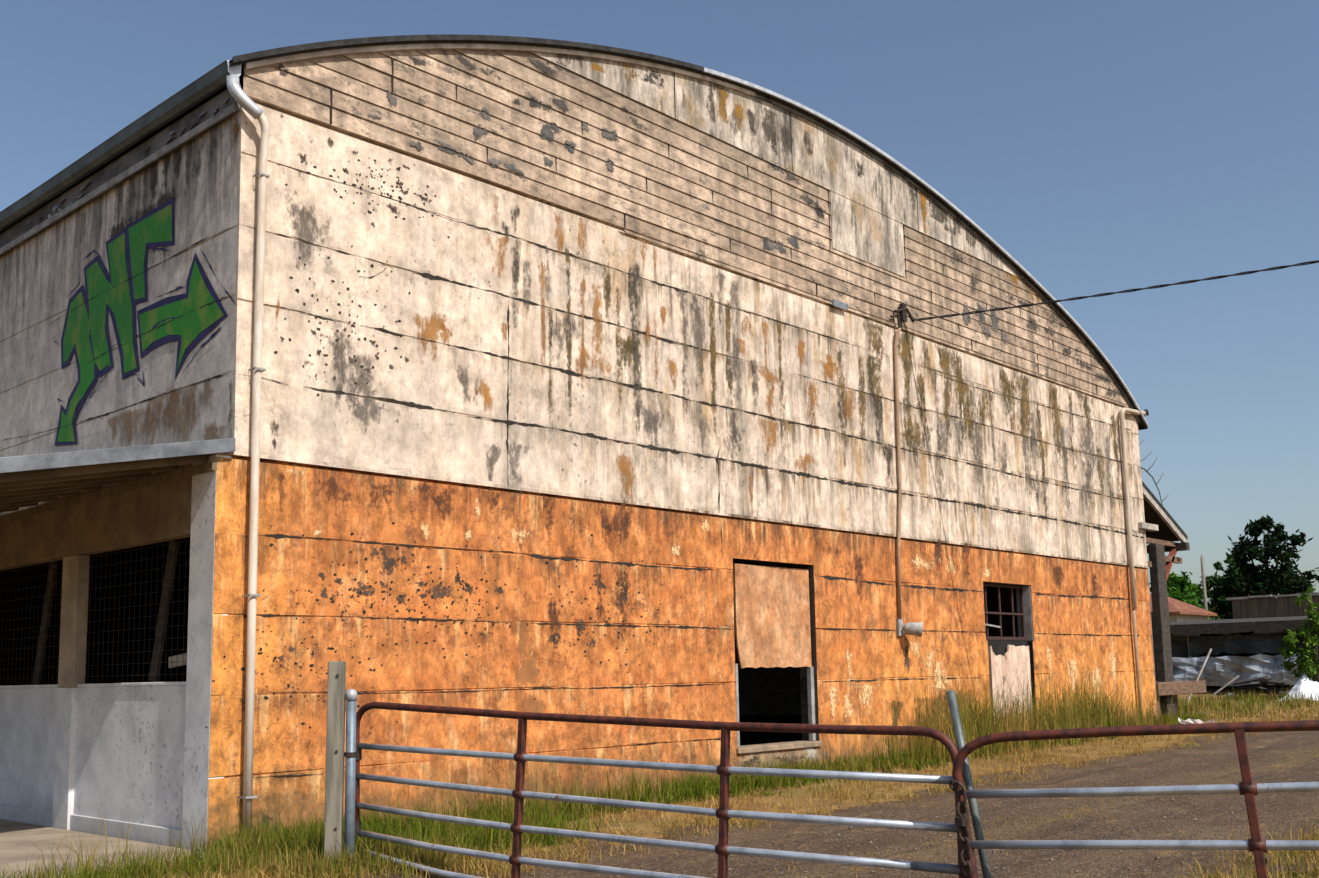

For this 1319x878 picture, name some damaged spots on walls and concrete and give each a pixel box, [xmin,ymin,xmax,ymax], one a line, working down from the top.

leakage [290,204,329,268]
leakage [502,207,531,327]
leakage [331,332,381,431]
rust [416,314,452,357]
leakage [486,444,526,508]
leakage [546,248,575,430]
rust [618,456,635,496]
leakage [603,264,664,446]
leakage [678,273,759,450]
leakage [777,323,786,458]
leakage [837,350,893,485]
leakage [898,332,1123,531]